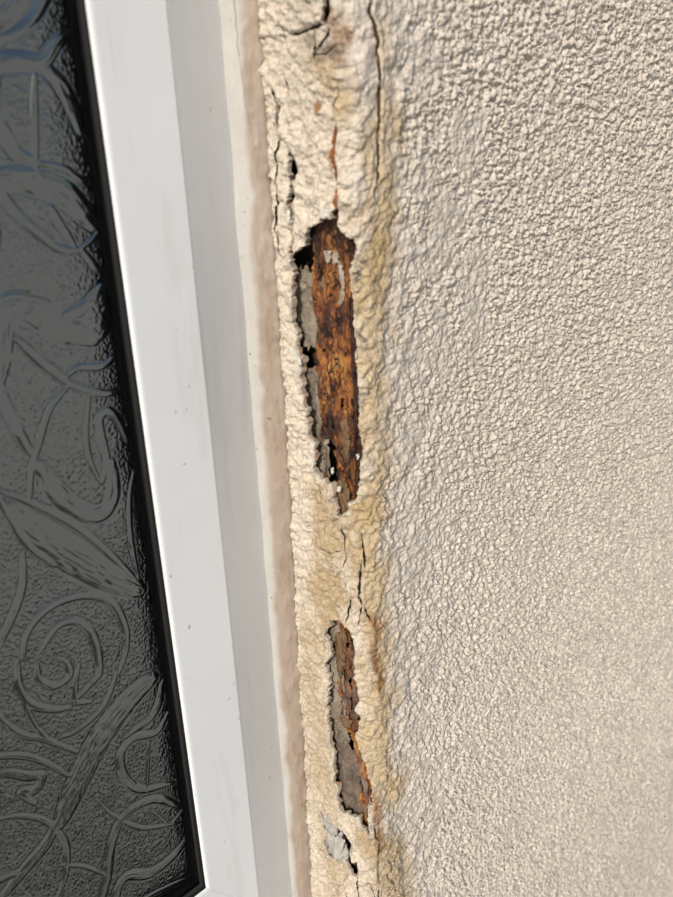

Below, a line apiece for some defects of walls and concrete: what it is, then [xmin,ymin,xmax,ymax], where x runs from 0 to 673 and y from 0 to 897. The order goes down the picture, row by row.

crack [233,0,289,256]
crack [281,0,335,59]
crack [329,90,339,209]
crack [367,0,382,207]
spalling [284,149,367,519]
corrosion [329,328,373,472]
crack [317,519,370,626]
spalling [319,616,374,877]
corrosion [334,477,408,897]
crack [333,825,380,897]